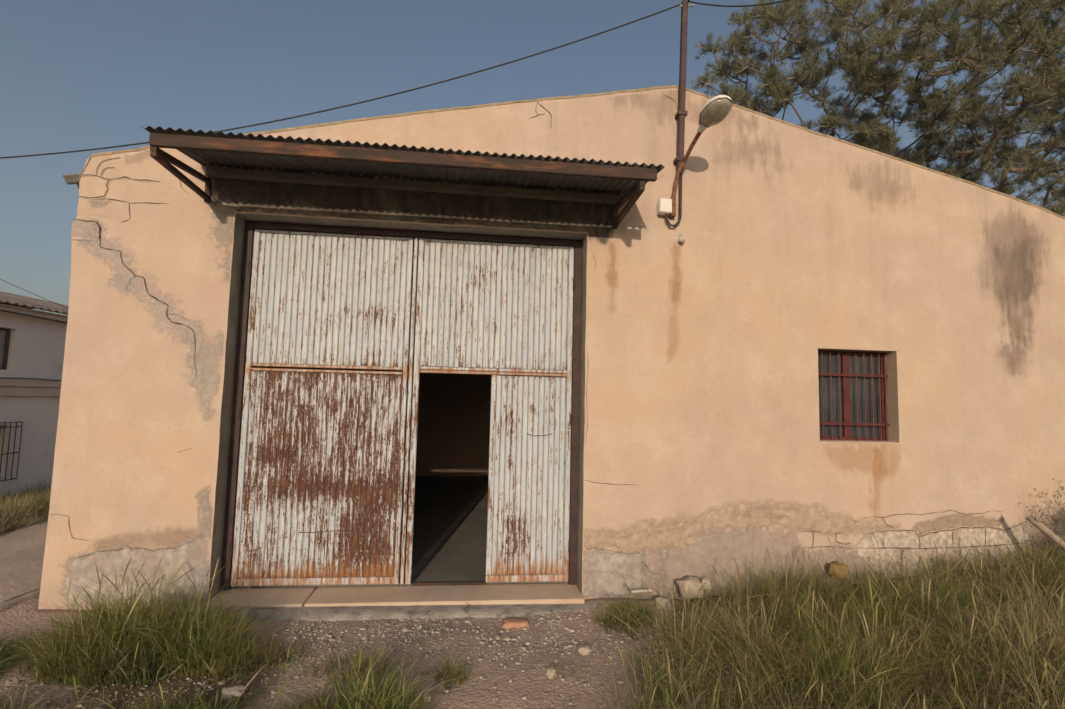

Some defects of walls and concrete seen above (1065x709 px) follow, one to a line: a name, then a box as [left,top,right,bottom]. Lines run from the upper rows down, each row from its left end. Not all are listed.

crack [75,157,197,380]
flaking render [62,535,209,608]
flaking render [852,514,1034,577]